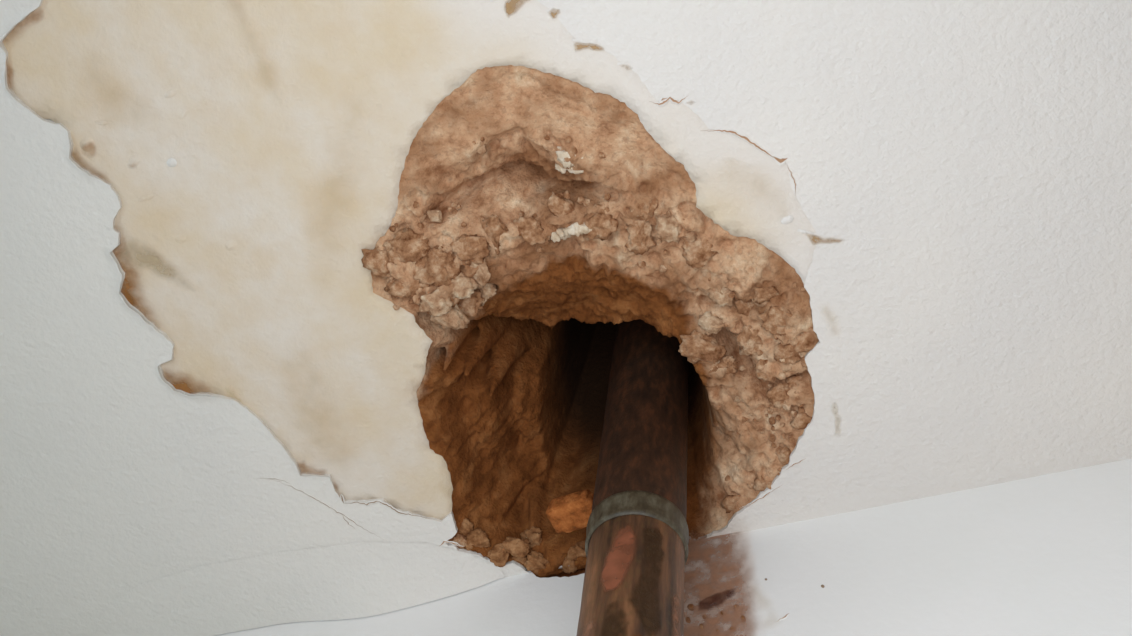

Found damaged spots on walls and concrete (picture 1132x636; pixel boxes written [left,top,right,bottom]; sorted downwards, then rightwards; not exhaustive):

crack [649,96,688,106]
crack [700,129,797,196]
peeling [0,0,840,578]
peeling [601,526,635,591]